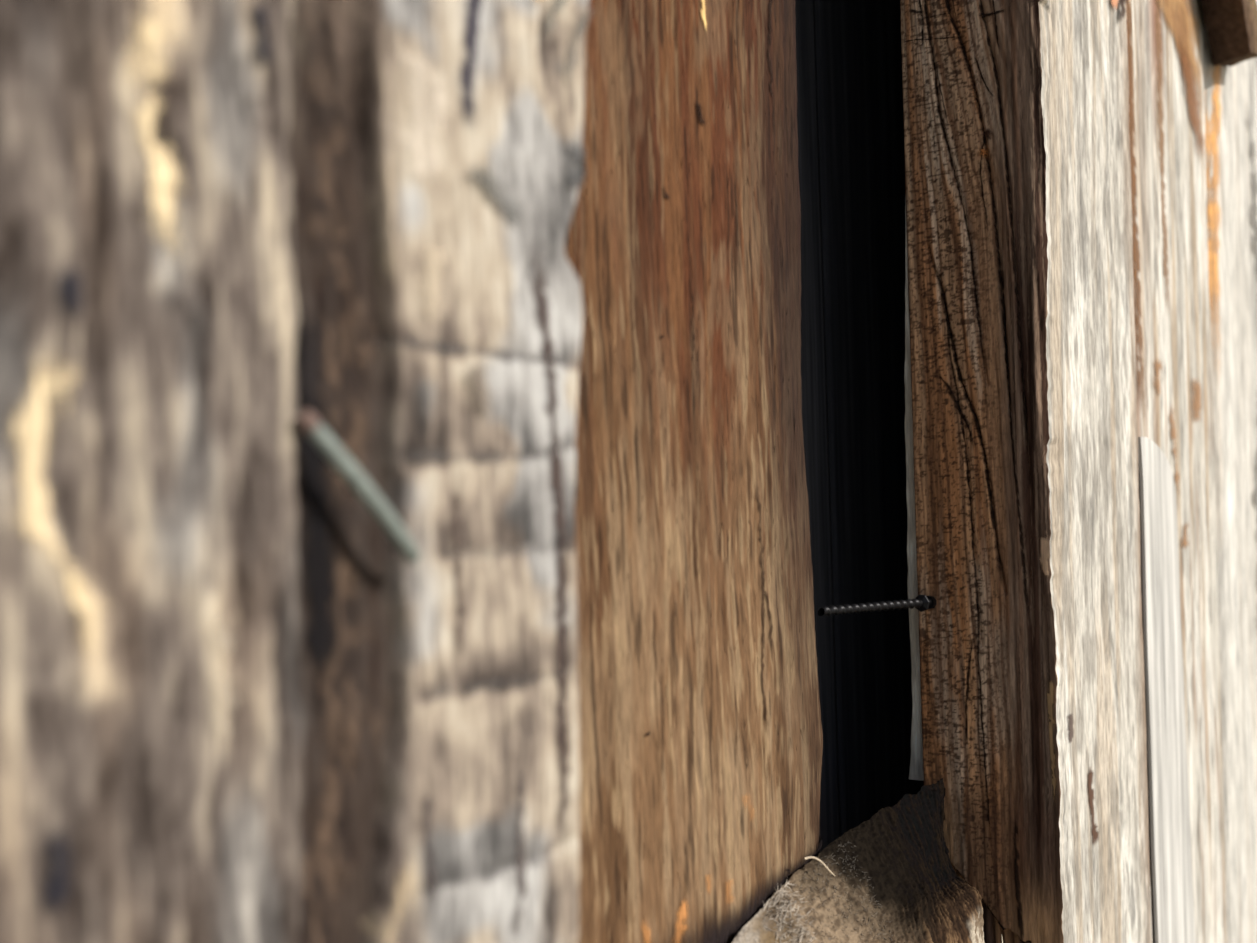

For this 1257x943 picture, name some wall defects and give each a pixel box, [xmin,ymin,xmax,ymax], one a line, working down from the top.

crack [904,0,1031,942]
corrosion [1205,65,1221,323]